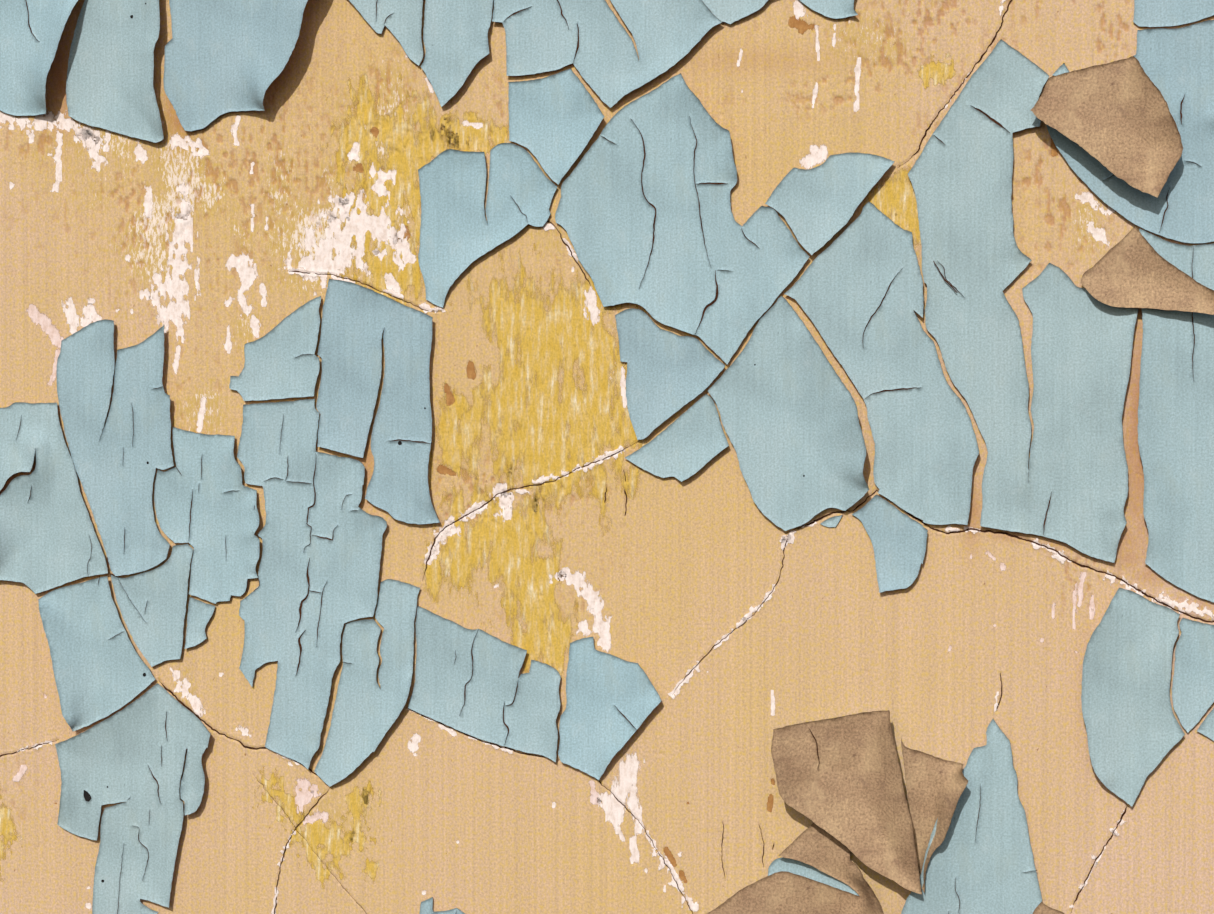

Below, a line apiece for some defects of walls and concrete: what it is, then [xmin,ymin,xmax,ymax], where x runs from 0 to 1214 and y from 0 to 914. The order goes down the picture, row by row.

peeling [555,0,1214,602]
peeling [0,0,768,914]
crack [407,631,545,757]
crack [422,440,640,581]
crack [667,490,1214,699]
crack [994,673,1002,712]
peeling [1073,571,1214,806]
leakage [0,795,22,881]
crack [117,682,367,914]
crack [595,778,699,914]
peeling [768,857,859,896]
peeling [901,719,1042,914]